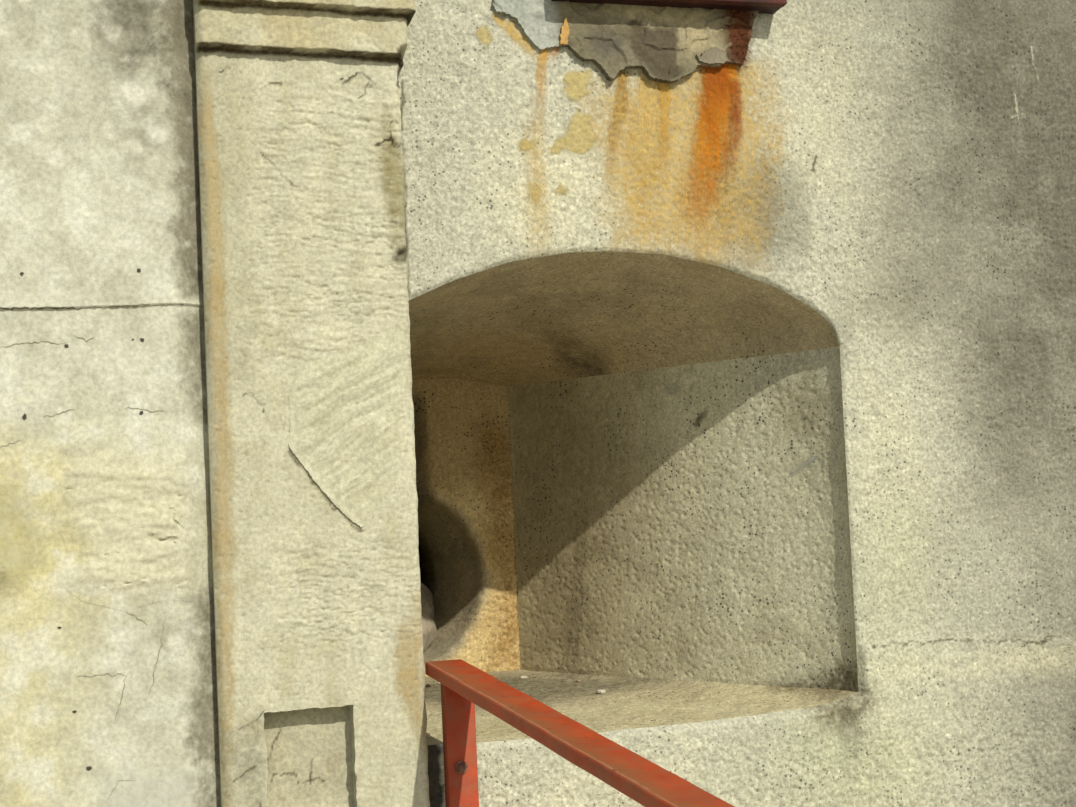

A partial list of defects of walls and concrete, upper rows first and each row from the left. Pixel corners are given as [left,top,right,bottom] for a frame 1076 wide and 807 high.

peeling [491,0,759,154]
corrosion [594,9,774,259]
crack [289,450,363,532]